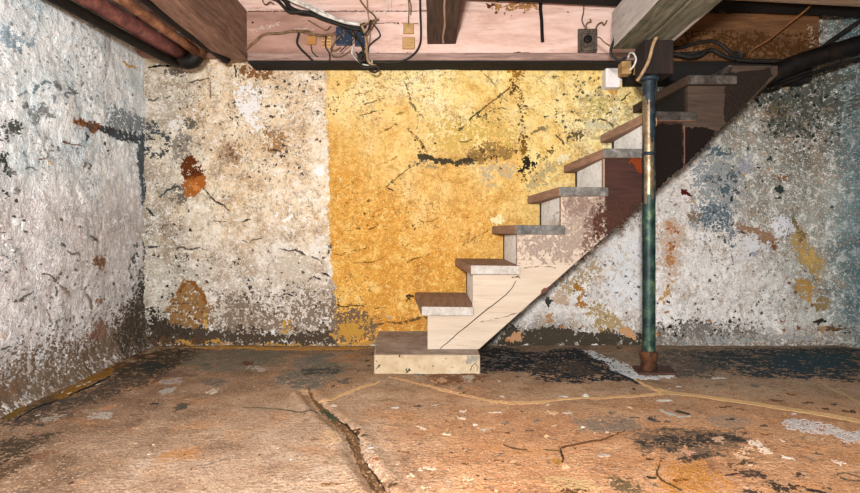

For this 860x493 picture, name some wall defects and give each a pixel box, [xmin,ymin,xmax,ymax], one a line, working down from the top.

spalling [755,79,846,138]
corrosion [180,153,207,199]
crack [203,52,510,281]
peeling [526,161,562,192]
damp [0,242,352,480]
spalling [505,331,524,344]
spalling [618,327,636,340]
damp [416,196,860,414]
crack [243,387,386,493]
damp [536,406,860,493]